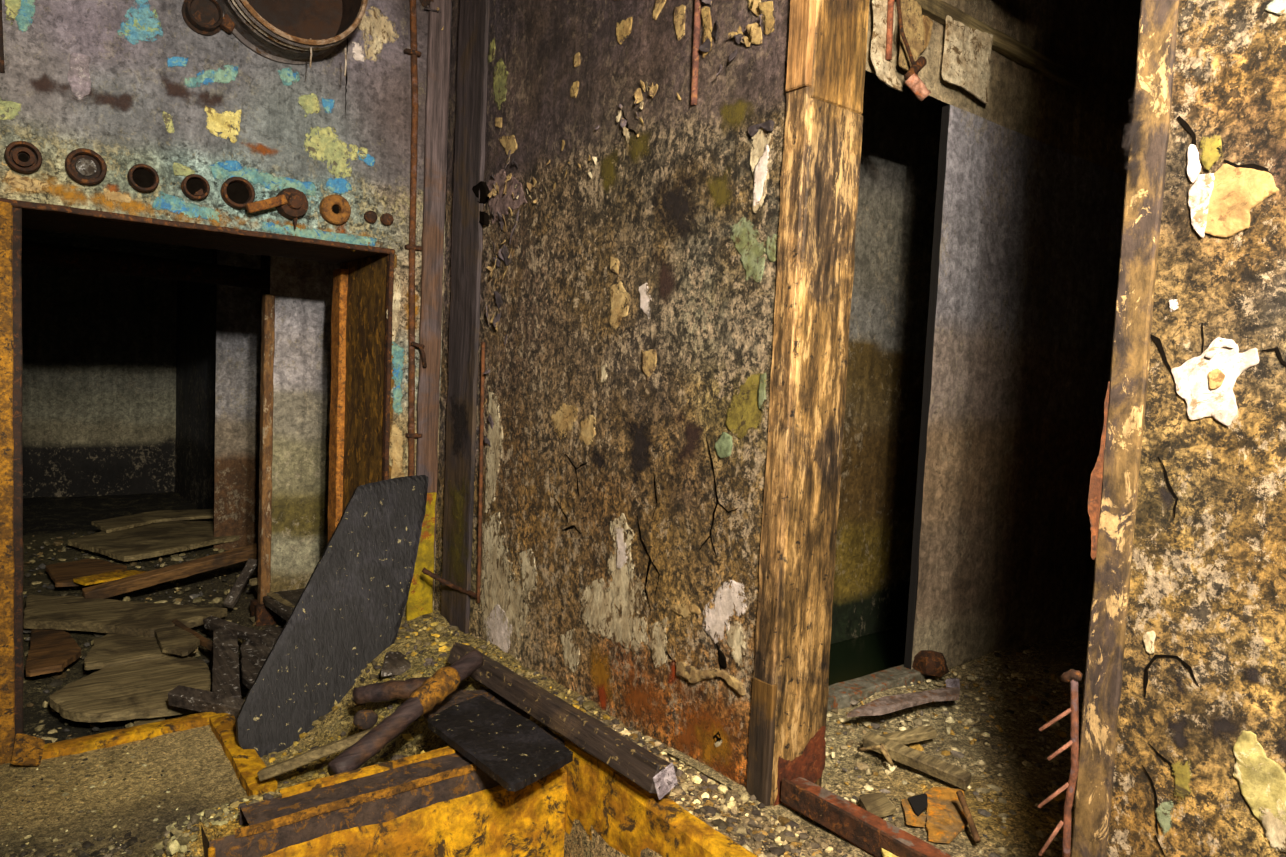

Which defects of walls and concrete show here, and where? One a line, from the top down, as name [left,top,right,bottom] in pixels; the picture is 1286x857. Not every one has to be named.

peeling [652,0,775,77]
rust [8,180,152,215]
peeling [152,67,375,222]
spalling [1187,135,1279,238]
crack [1150,334,1171,371]
crack [1198,323,1206,353]
spalling [1171,337,1260,426]
crack [1261,347,1286,366]
crack [1158,457,1178,518]
spalling [560,513,747,695]
rust [590,652,741,783]
spalling [1233,730,1286,852]